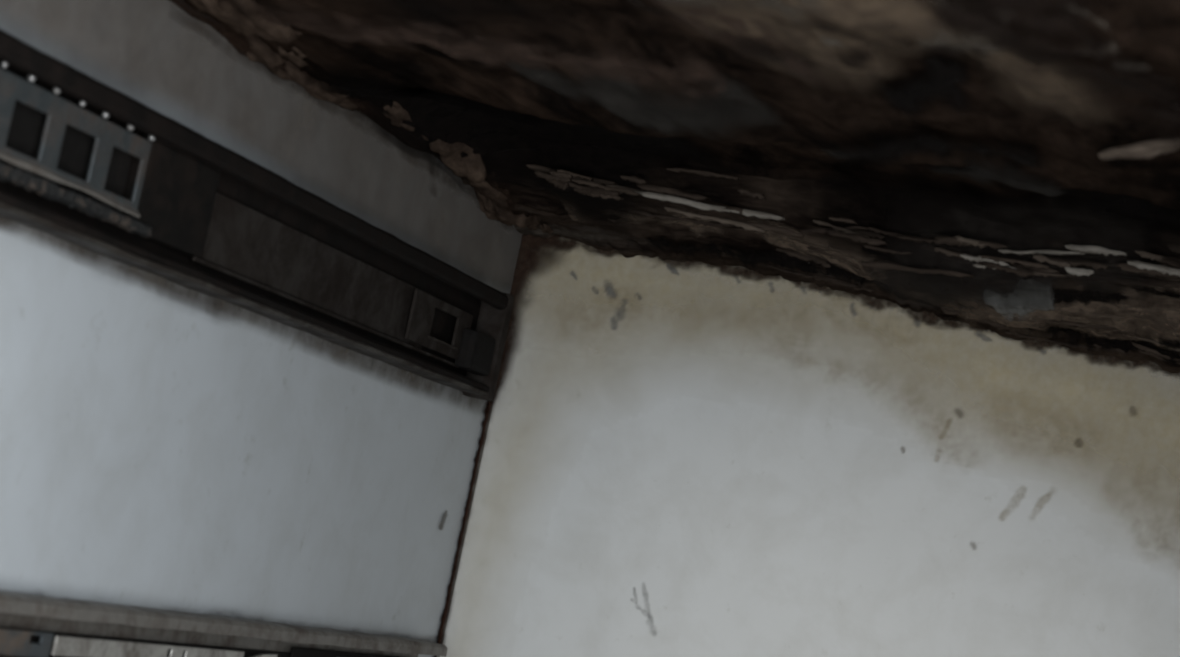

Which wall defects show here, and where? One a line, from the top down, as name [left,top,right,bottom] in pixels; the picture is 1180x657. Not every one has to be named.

damp [170,0,252,57]
peeling [188,0,358,111]
peeling [629,0,1099,118]
peeling [383,89,553,235]
damp [326,79,726,225]
peeling [1098,138,1180,160]
damp [817,174,1180,269]
peeling [873,205,1146,318]
damp [494,234,1180,474]